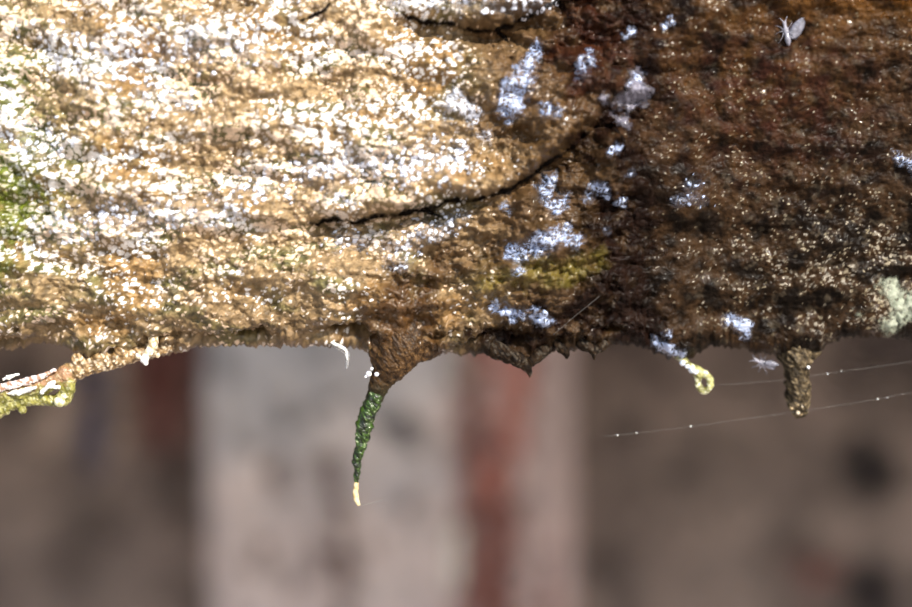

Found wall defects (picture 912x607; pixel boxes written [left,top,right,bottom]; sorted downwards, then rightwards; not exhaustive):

crack [397,0,585,43]
water stain [0,104,78,164]
crack [310,104,625,227]
water stain [726,313,753,339]